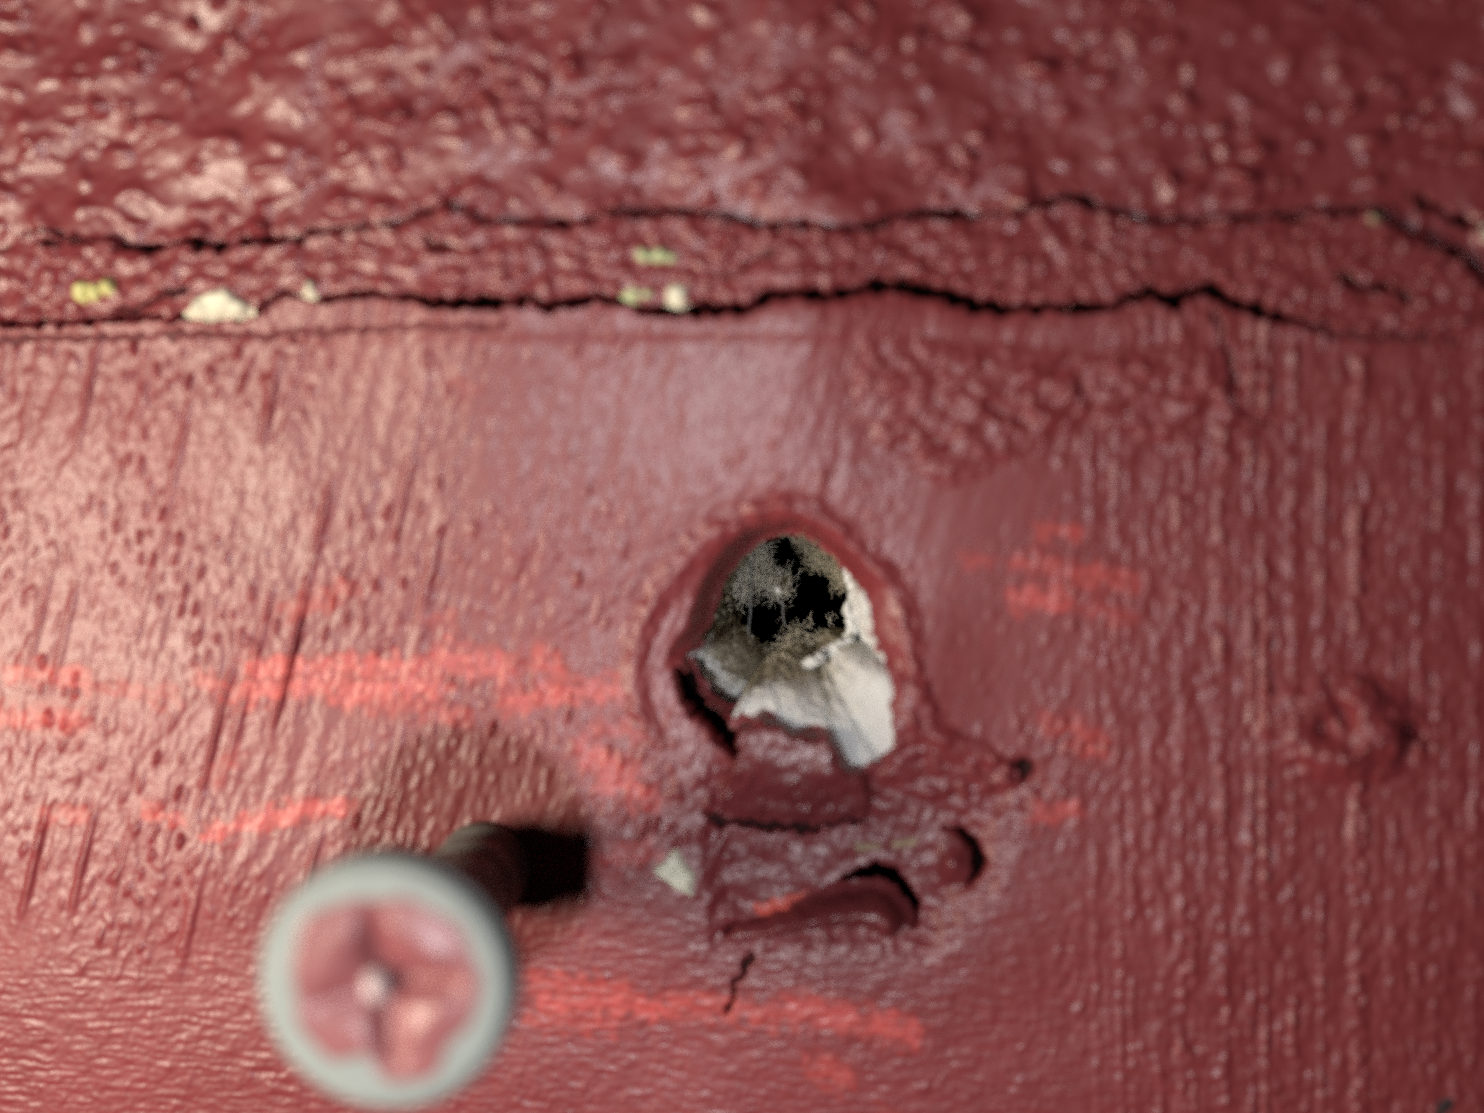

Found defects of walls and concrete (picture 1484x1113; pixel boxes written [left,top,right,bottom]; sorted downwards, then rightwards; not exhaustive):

crack [366,182,462,251]
crack [2,206,1330,330]
crack [1014,190,1095,218]
crack [1194,192,1484,285]
crack [1334,272,1411,307]
hole [735,537,849,646]
spalling [1013,757,1034,780]
peeling [654,848,696,897]
spalling [727,838,920,941]